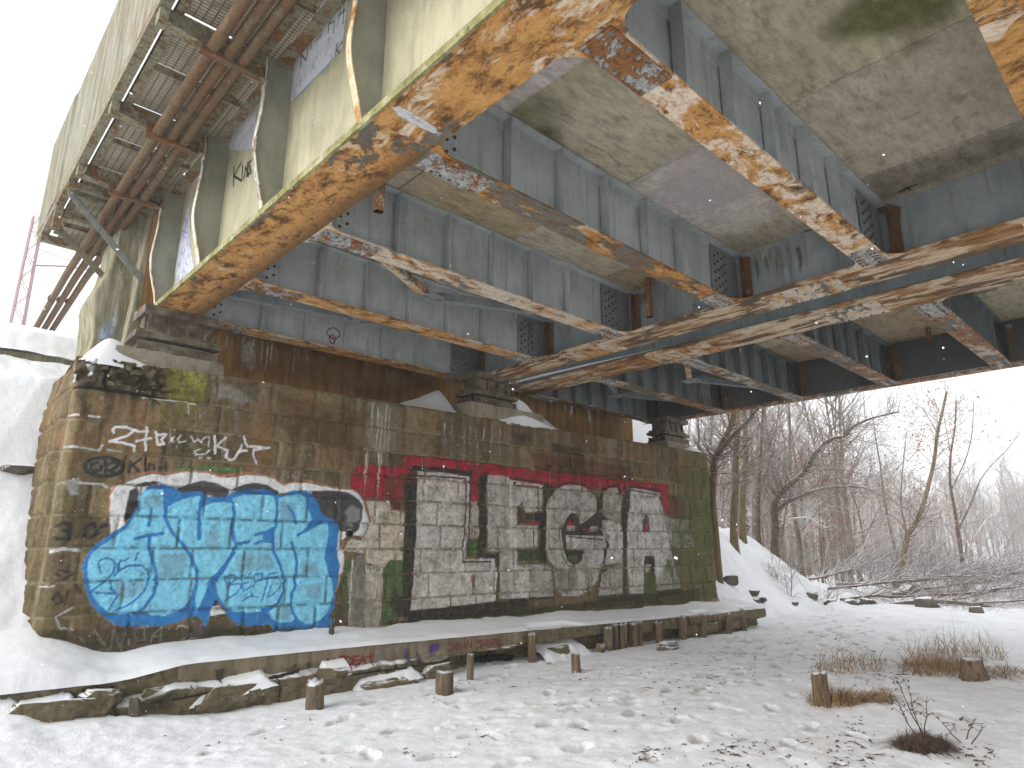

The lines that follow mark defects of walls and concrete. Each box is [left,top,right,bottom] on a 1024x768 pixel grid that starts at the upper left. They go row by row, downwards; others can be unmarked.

spalling [73,364,203,396]
water stain [364,401,398,482]